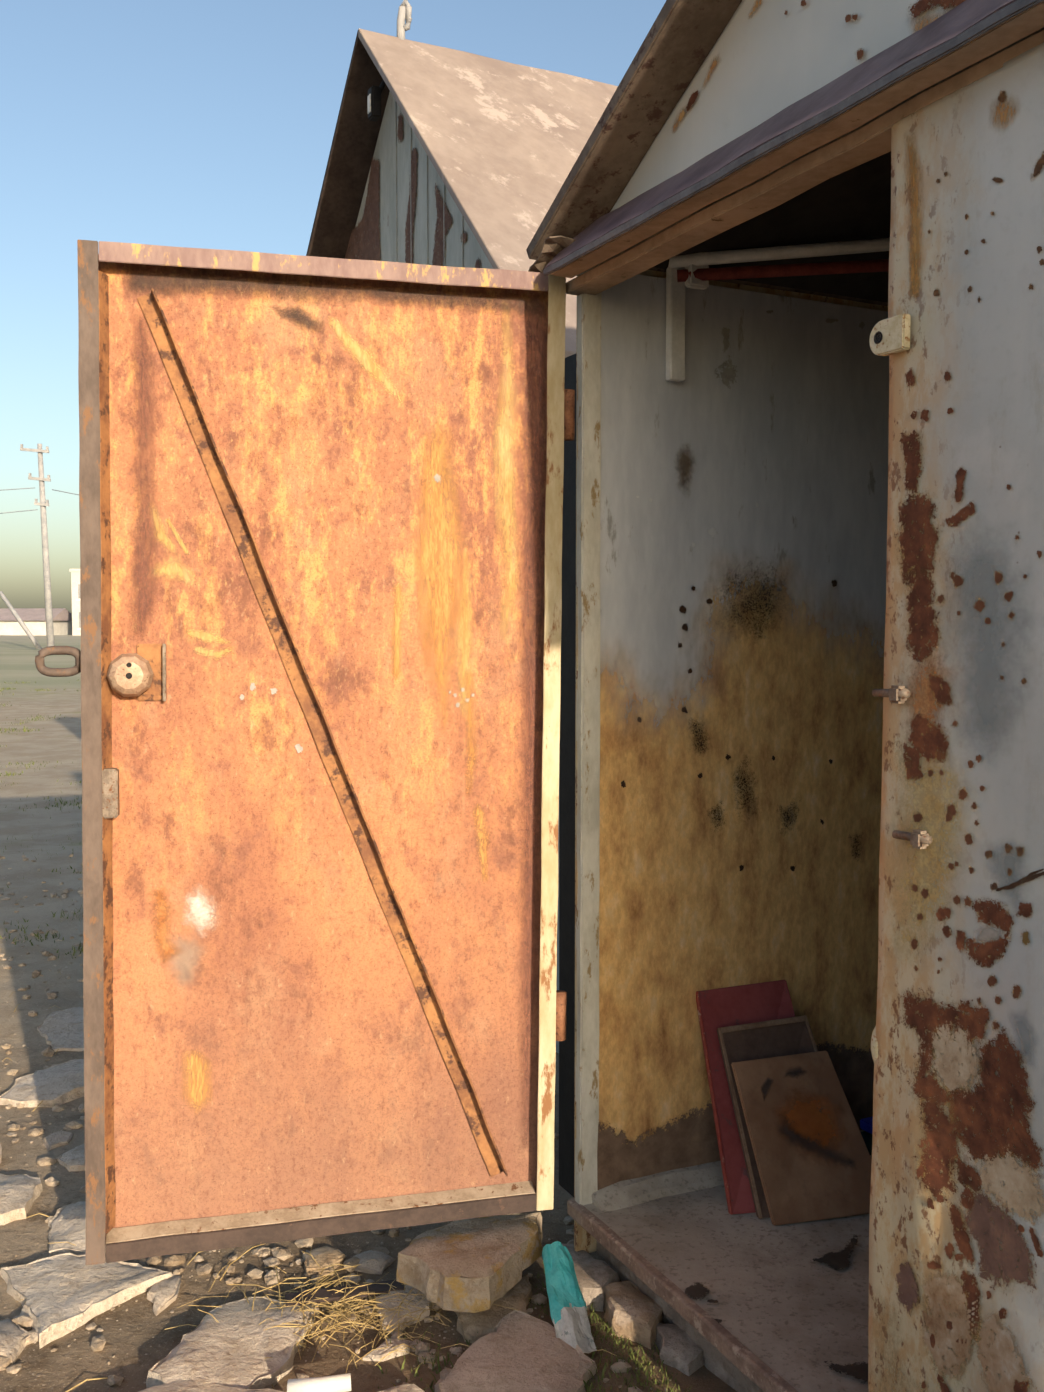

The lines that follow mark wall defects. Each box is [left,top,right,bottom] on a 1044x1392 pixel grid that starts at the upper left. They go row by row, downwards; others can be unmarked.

rust [908,0,966,32]
rust [330,319,400,399]
rust [905,367,915,386]
rust [135,319,189,631]
rust [678,452,692,486]
rust [496,309,545,1087]
rust [894,409,1032,1005]
rust [599,581,884,1151]
damp [597,1099,720,1190]
damp [817,1041,874,1131]
peeling [898,988,1044,1392]
rust [921,1270,981,1389]